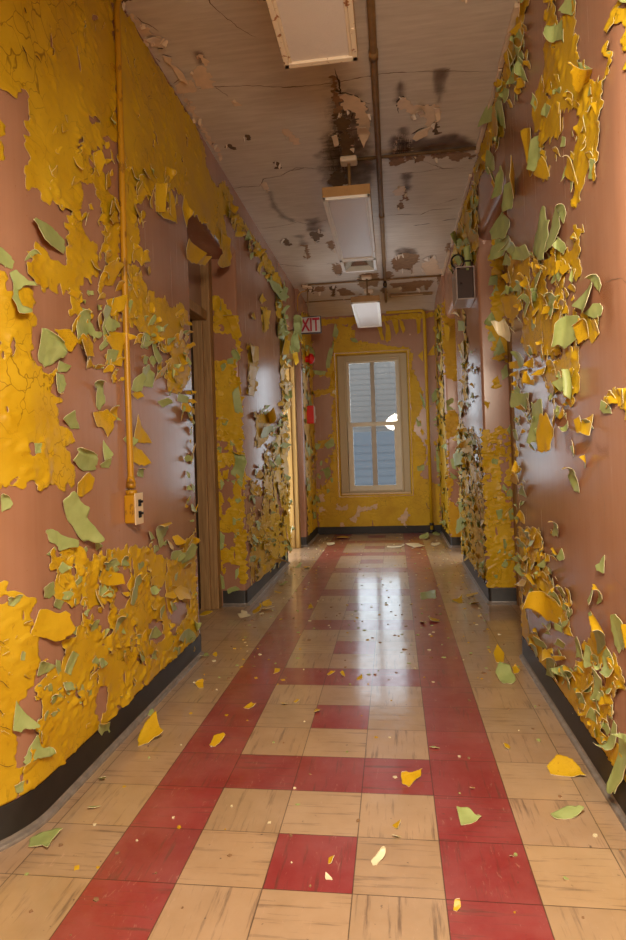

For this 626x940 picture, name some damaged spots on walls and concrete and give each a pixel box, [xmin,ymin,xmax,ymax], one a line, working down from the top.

peeling [604,0,626,52]
crack [200,69,489,131]
leakage [325,102,374,184]
leakage [391,132,471,154]
peeling [431,0,613,453]
peeling [0,0,443,806]
peeling [377,299,626,794]